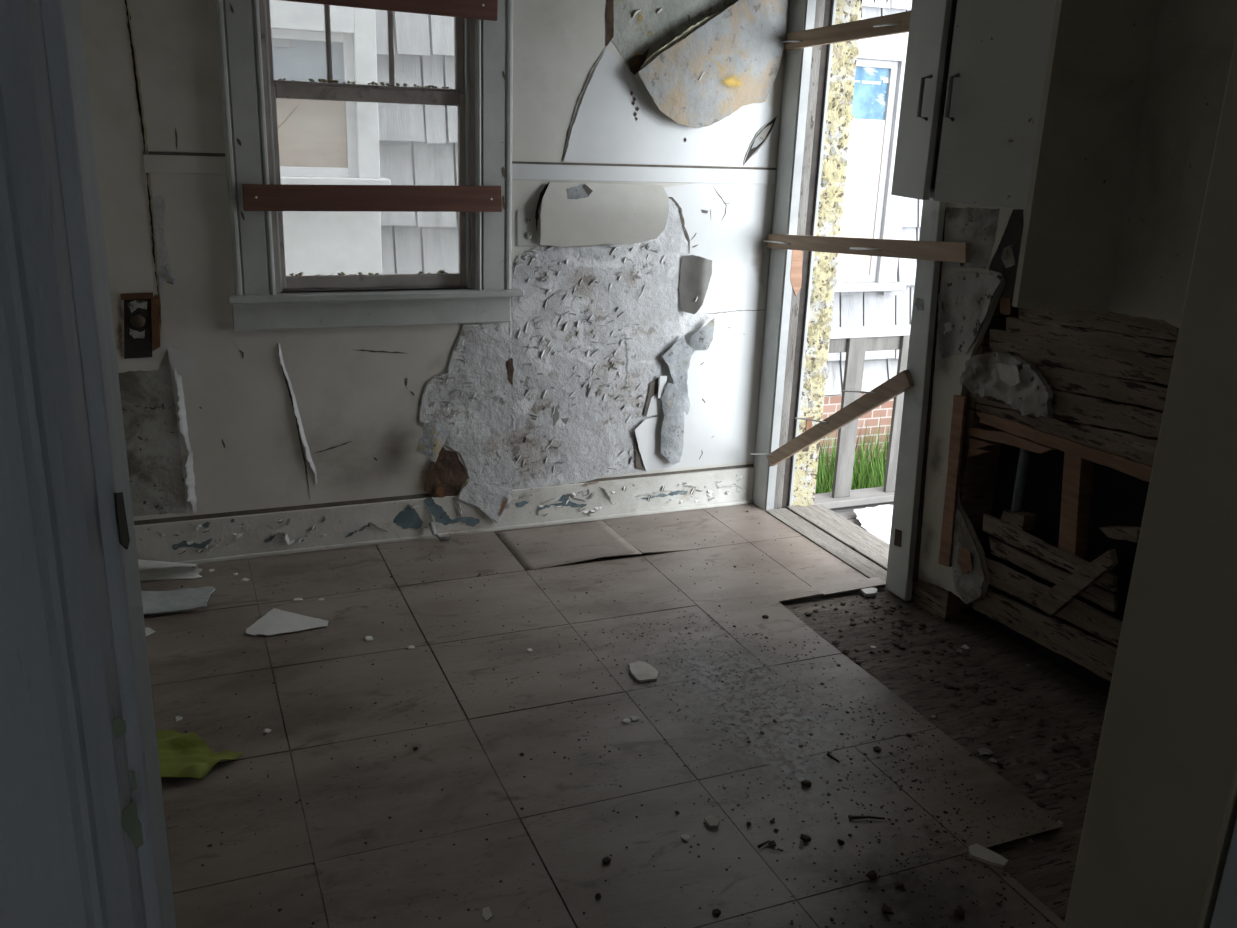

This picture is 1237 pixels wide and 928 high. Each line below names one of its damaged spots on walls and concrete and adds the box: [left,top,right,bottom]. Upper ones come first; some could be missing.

flaking render [605,0,738,75]
crack [125,0,162,331]
flaking render [118,347,243,554]
flaking render [346,197,746,541]
peeling [997,363,1021,386]